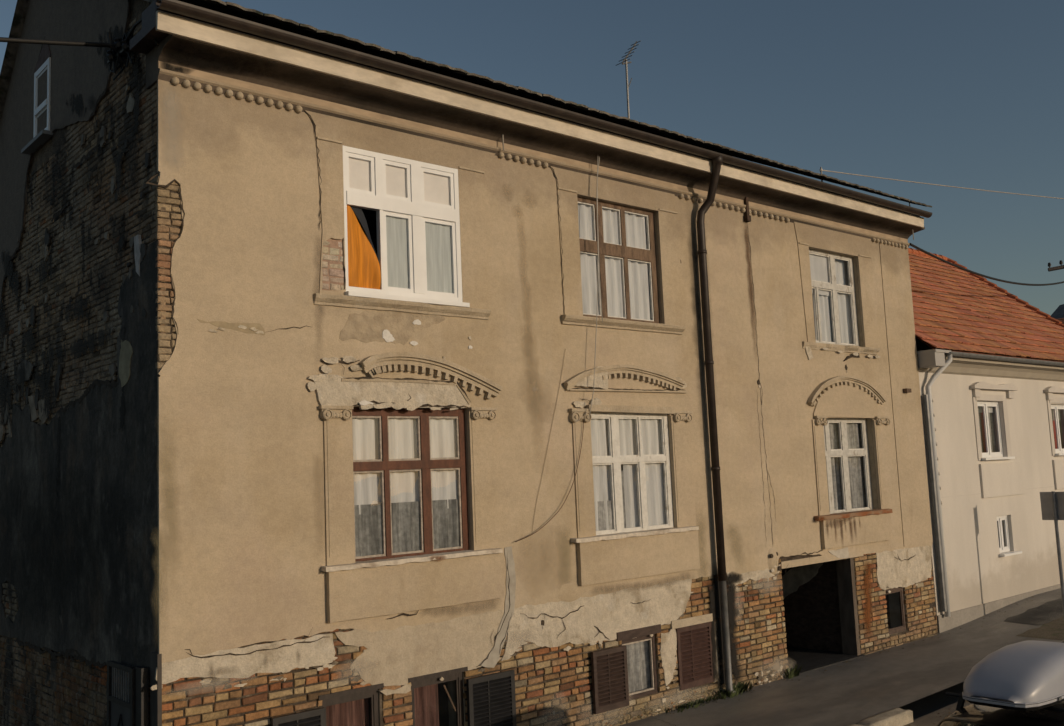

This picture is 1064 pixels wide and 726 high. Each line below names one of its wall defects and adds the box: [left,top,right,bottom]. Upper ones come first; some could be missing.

flaking render [0,51,182,447]
flaking render [322,238,345,291]
spalling [339,309,445,346]
flaking render [307,356,458,411]
crack [748,231,776,541]
flaking render [150,556,823,726]
crack [477,559,610,667]
flaking render [853,545,938,655]